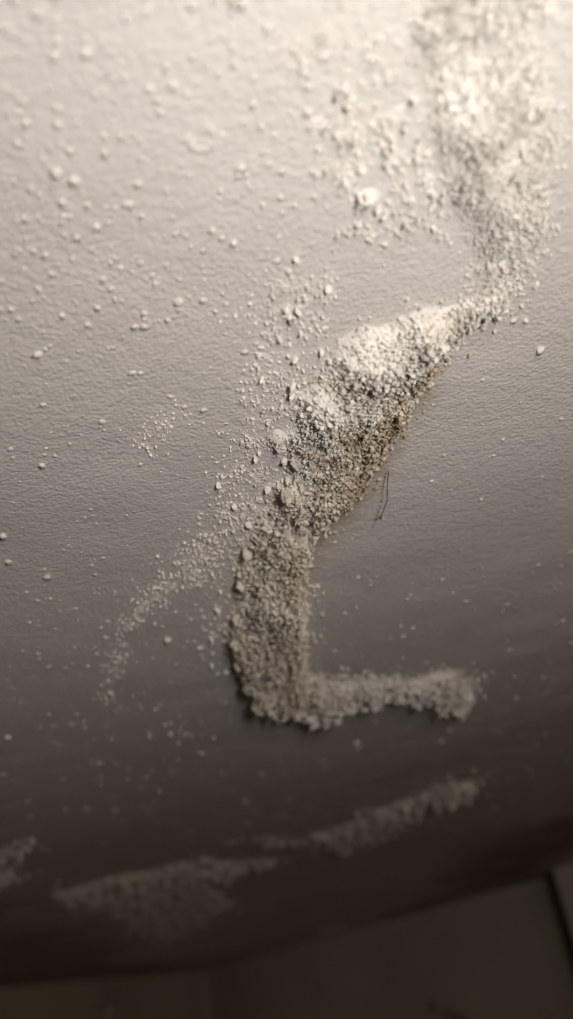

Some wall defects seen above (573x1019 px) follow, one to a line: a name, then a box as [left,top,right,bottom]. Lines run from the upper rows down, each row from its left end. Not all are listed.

water stain [202,0,573,730]
water stain [0,770,508,947]